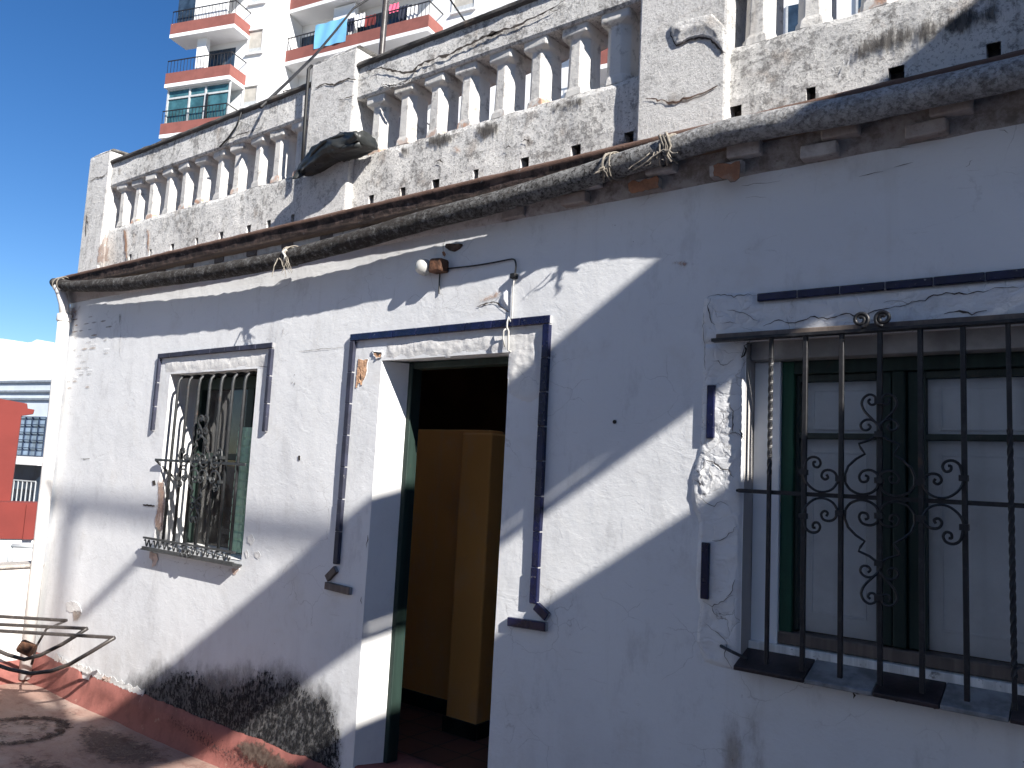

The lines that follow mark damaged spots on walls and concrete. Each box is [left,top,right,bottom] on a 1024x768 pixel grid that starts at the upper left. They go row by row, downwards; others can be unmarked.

crack [316,0,565,100]
crack [646,85,718,104]
peeling [356,351,384,388]
crack [702,287,1018,370]
spalling [143,480,166,531]
crack [692,457,737,541]
crack [703,580,735,665]
water stain [135,670,341,768]